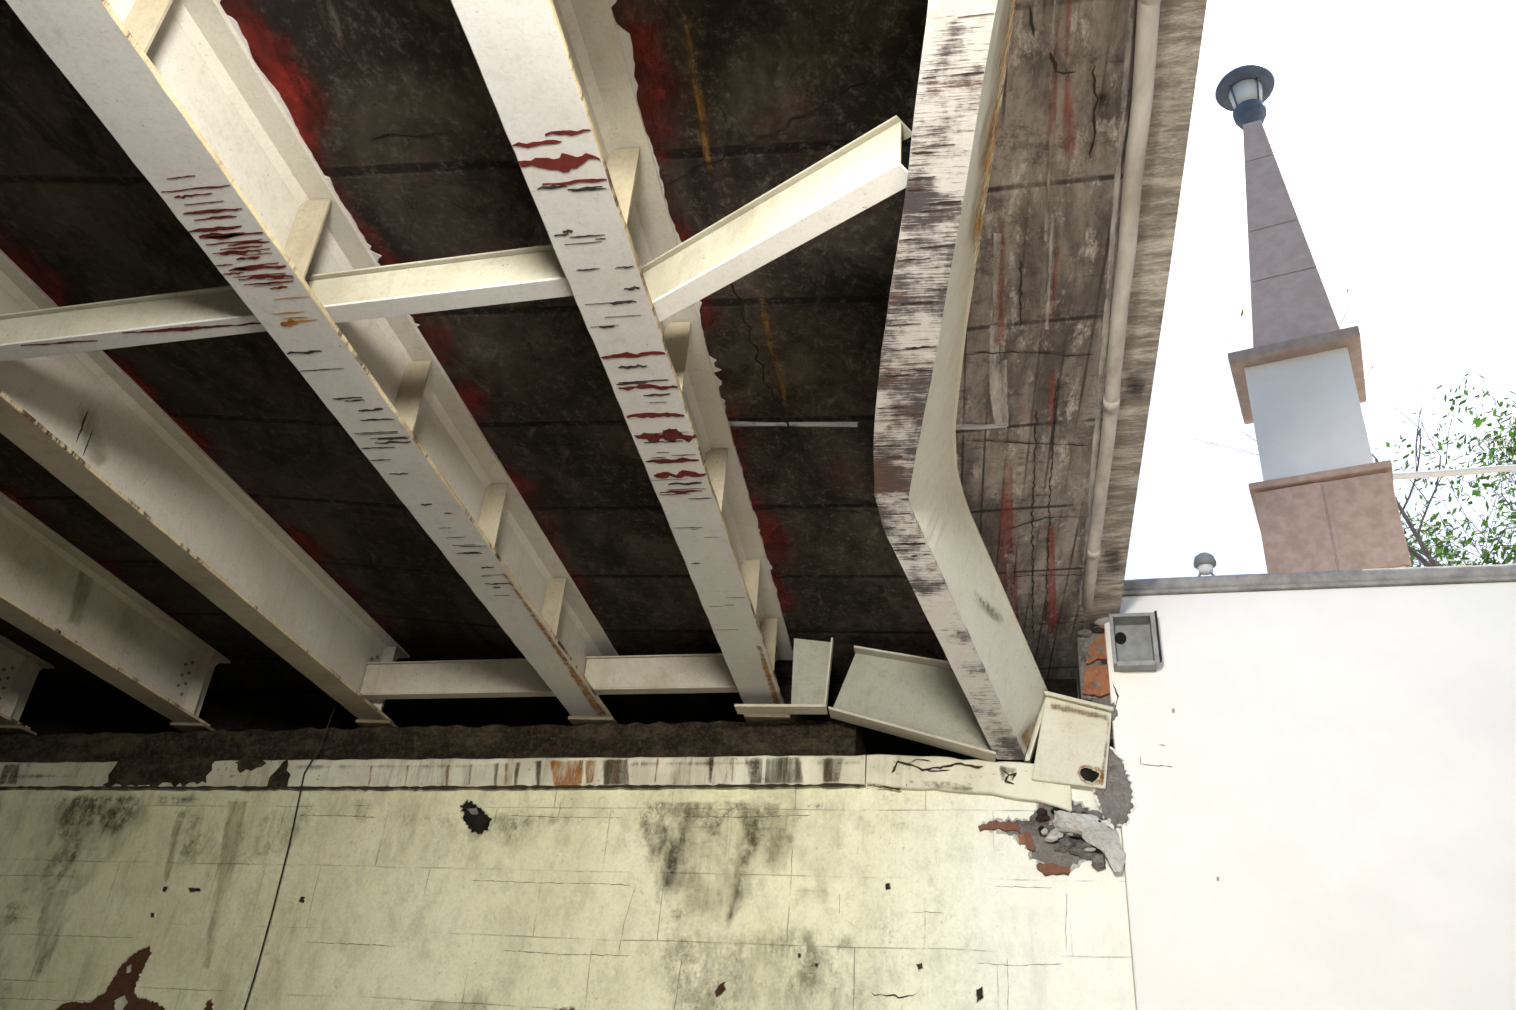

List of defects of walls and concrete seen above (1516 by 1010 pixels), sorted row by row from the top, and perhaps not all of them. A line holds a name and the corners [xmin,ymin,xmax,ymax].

crack [1029,7,1099,159]
crack [865,756,1017,791]
damp [61,797,134,864]
hole [460,799,493,835]
damp [644,804,759,919]
spalling [978,800,1126,876]
peeling [53,944,167,1010]